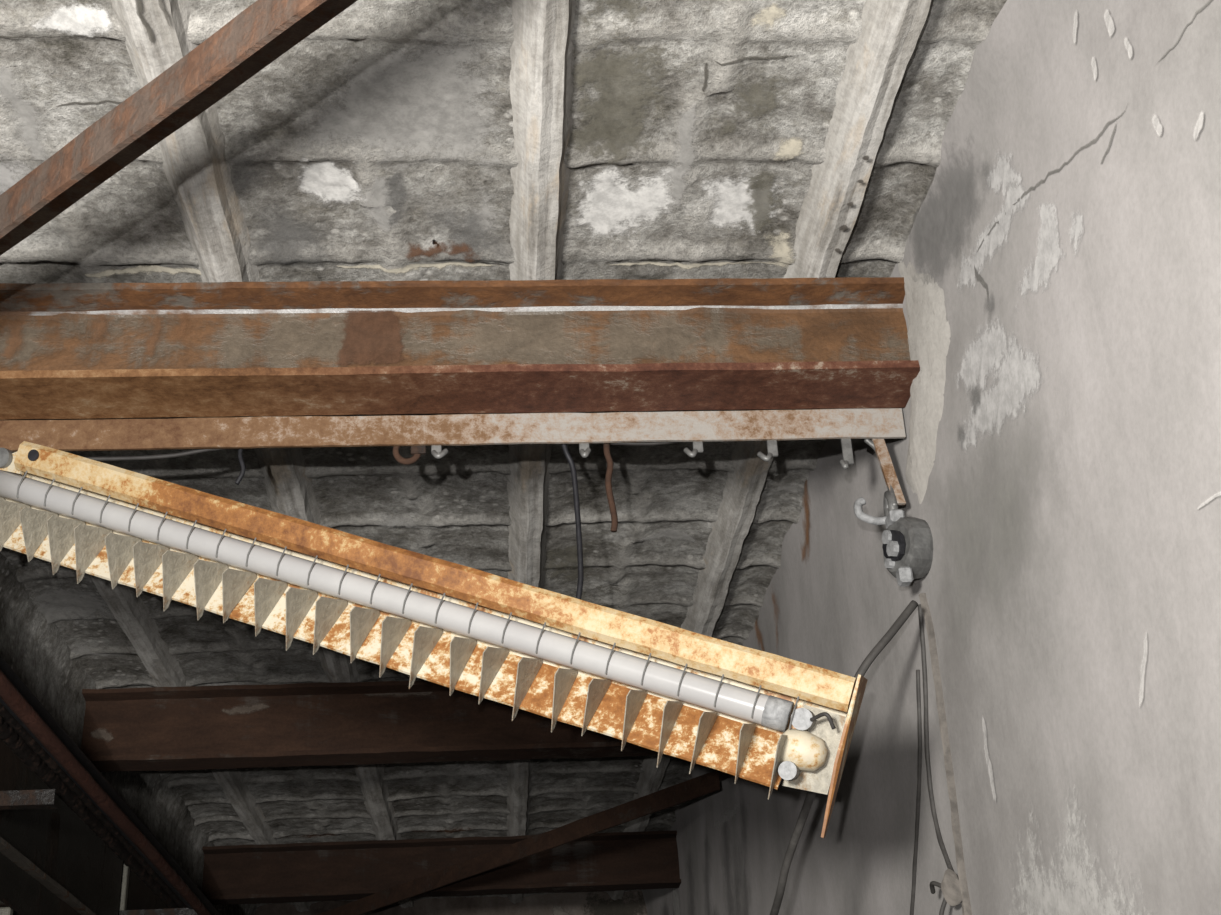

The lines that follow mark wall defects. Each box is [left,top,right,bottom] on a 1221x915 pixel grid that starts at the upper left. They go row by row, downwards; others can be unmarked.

water stain [33,4,111,37]
crack [1159,0,1212,61]
water stain [300,36,499,230]
water stain [567,0,694,235]
water stain [776,137,802,159]
water stain [85,265,201,278]
water stain [338,199,497,274]
water stain [611,172,794,269]
water stain [915,154,1083,295]
crack [974,106,1127,299]
corrosion [338,310,404,366]
water stain [1018,805,1134,915]